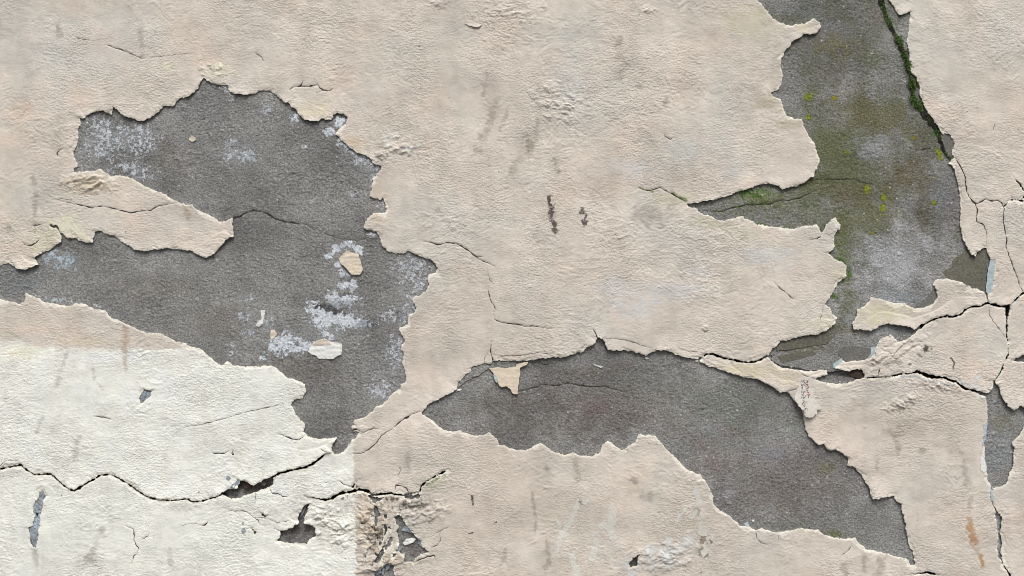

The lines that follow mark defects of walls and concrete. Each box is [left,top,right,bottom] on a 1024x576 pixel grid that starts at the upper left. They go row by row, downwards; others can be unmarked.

peeling [0,78,438,454]
crack [233,209,374,241]
water stain [238,232,433,400]
water stain [322,116,381,185]
peeling [422,0,995,565]
crack [679,348,772,363]
crack [878,0,1024,377]
crack [0,434,328,531]
peeling [217,473,279,499]
peeling [278,504,321,544]
crack [312,470,446,501]
peeling [977,377,1024,559]